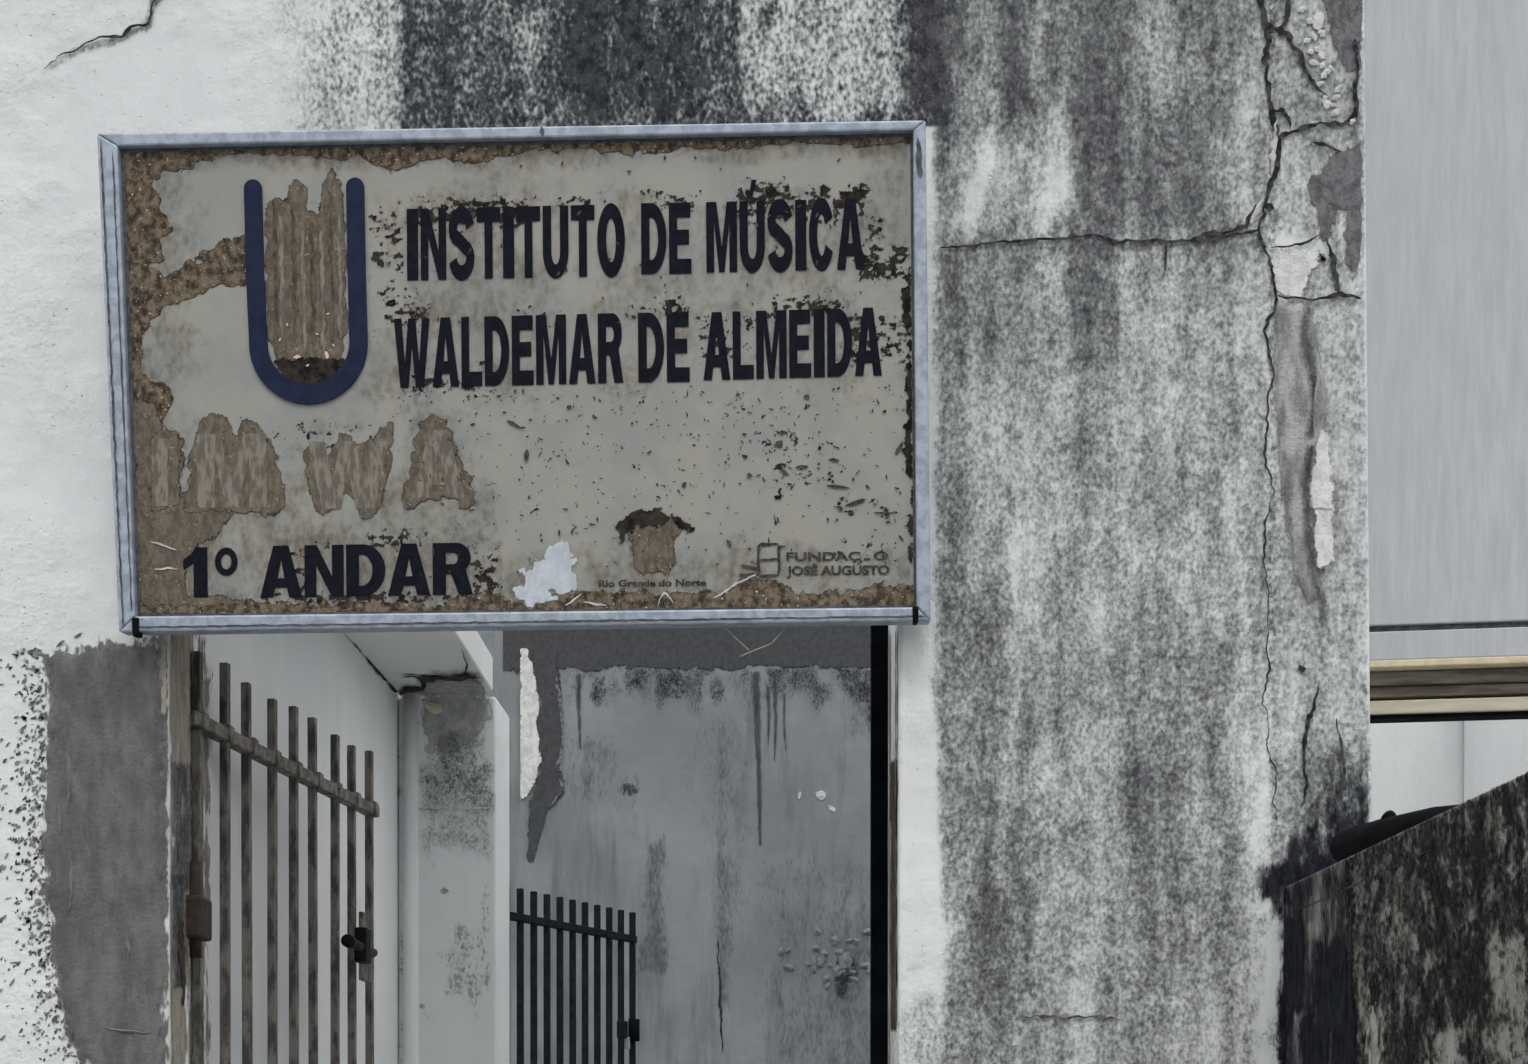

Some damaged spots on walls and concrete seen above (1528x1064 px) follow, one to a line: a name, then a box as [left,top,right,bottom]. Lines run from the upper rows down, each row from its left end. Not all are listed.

crack [43,0,157,70]
spalling [1293,0,1363,125]
spalling [1273,143,1363,297]
damp [304,0,1432,1064]
crack [939,0,1361,819]
peeling [1309,429,1335,568]
peeling [0,632,83,1064]
peeling [889,760,897,1032]